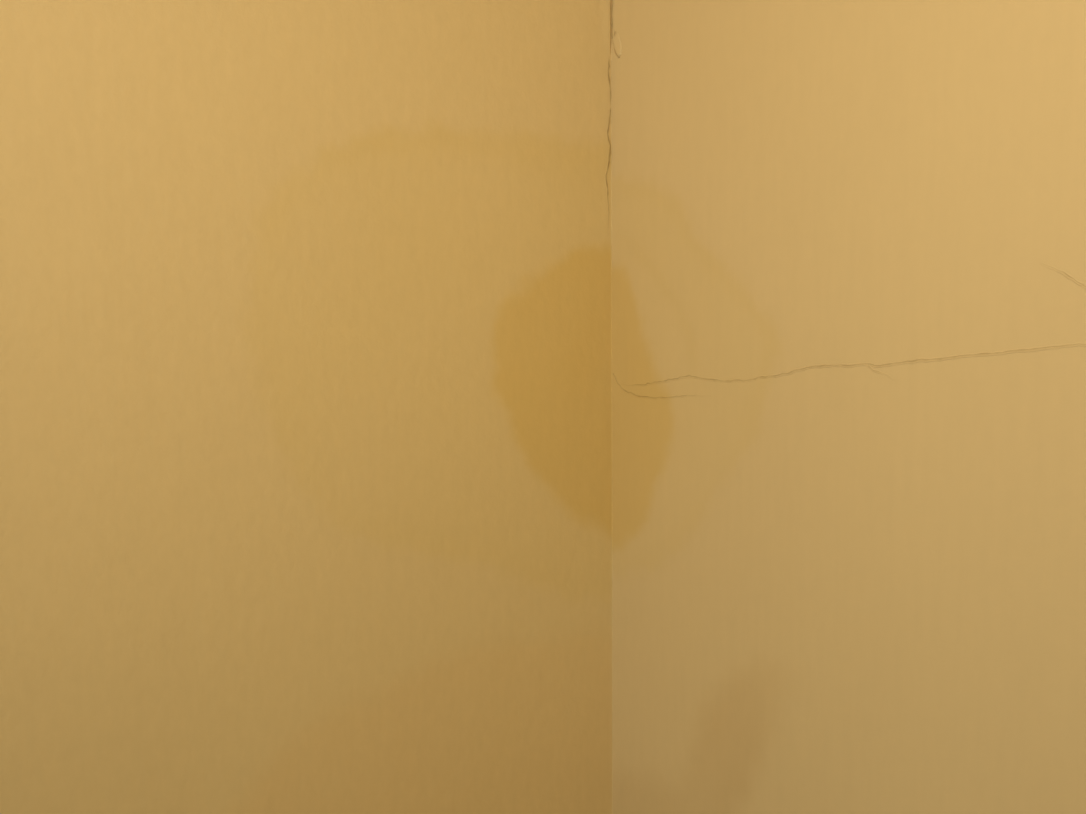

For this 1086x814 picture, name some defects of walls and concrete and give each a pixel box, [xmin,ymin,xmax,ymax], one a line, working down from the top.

leakage [211,110,812,814]
crack [613,342,1086,399]